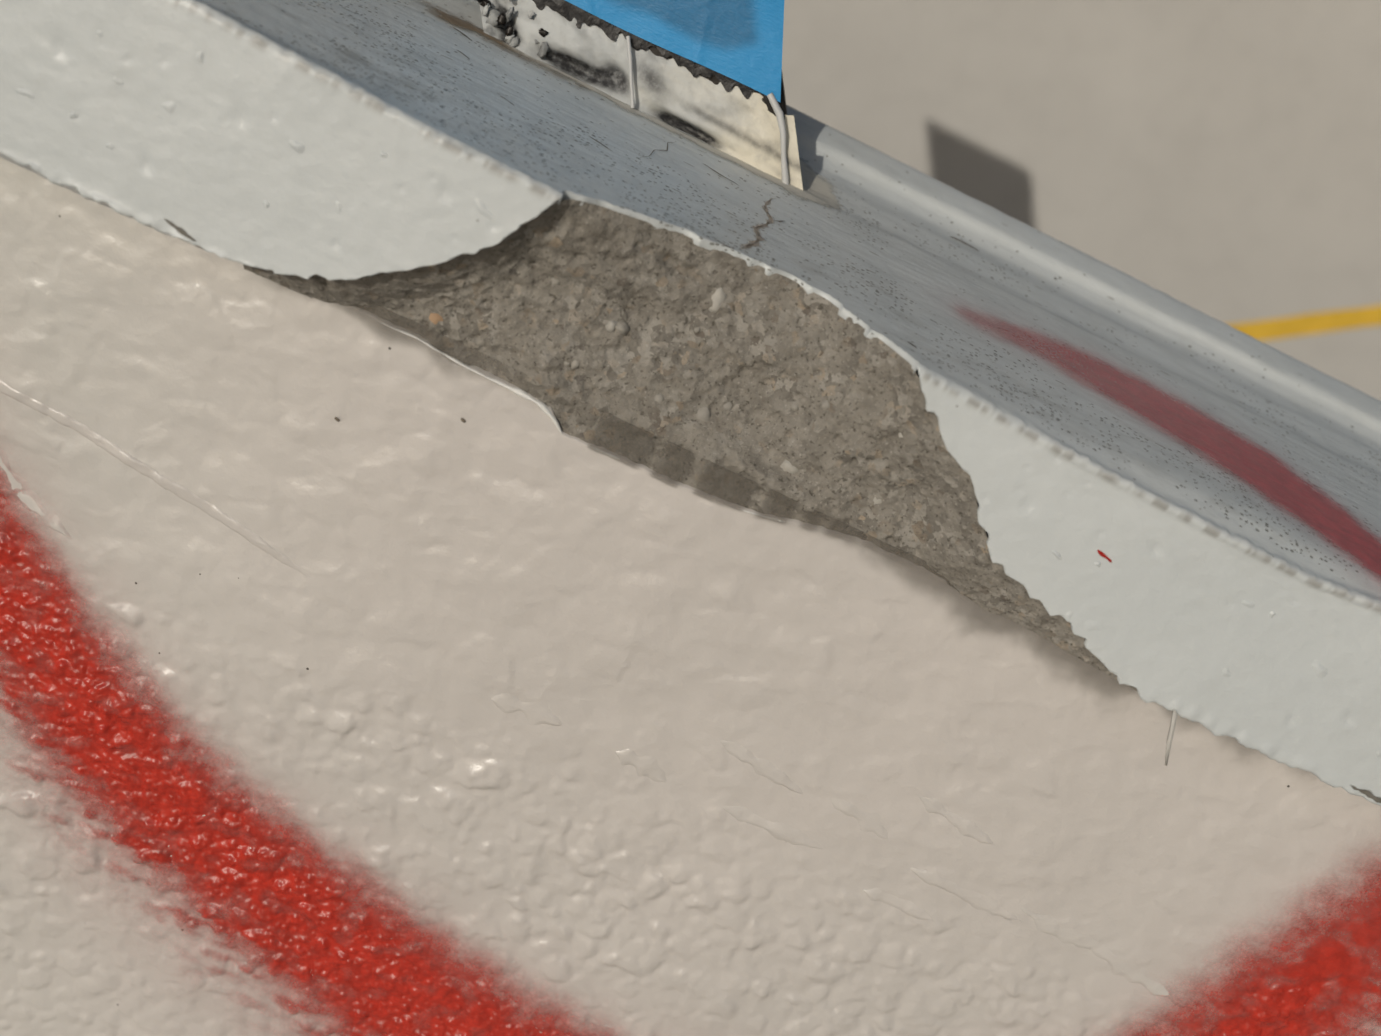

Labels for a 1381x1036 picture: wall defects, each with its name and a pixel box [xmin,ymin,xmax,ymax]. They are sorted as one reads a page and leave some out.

spalling [243,199,1137,691]
crack [716,199,782,249]